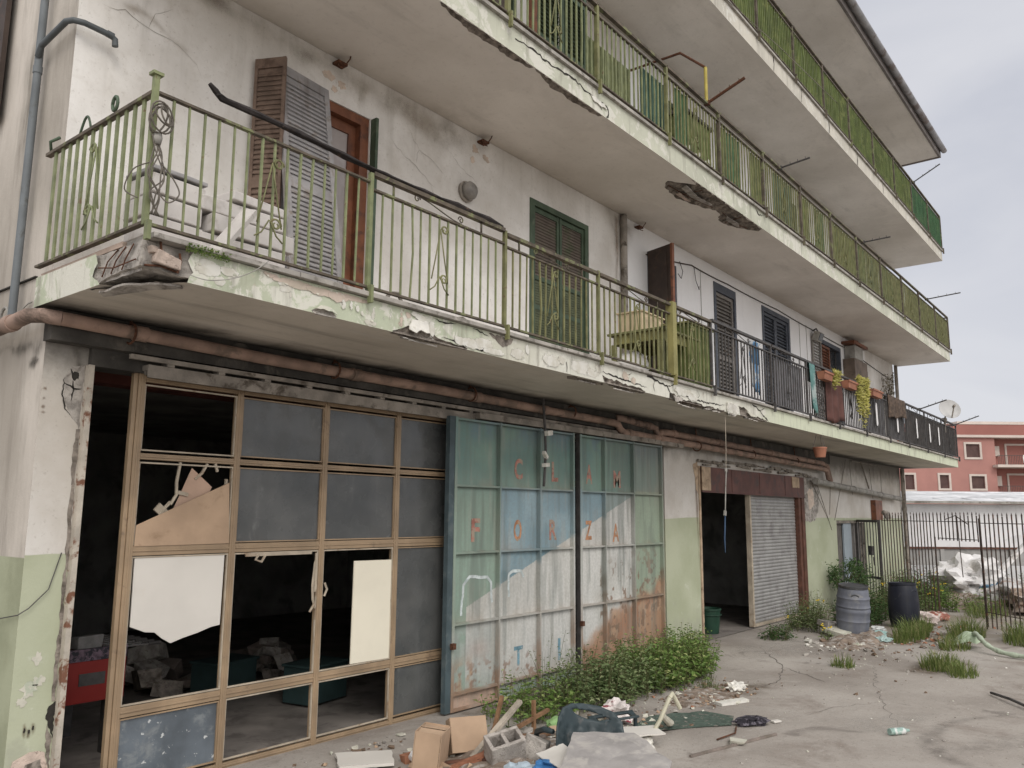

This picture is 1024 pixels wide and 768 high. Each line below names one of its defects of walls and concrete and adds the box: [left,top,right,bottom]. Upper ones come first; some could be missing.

crack [515,38,609,118]
spalling [665,180,761,231]
spalling [91,239,239,297]
peeling [264,271,376,326]
spalling [390,310,529,359]
crack [61,365,85,429]
peeling [543,353,646,394]
spalling [667,386,767,422]
flaking render [11,429,80,768]